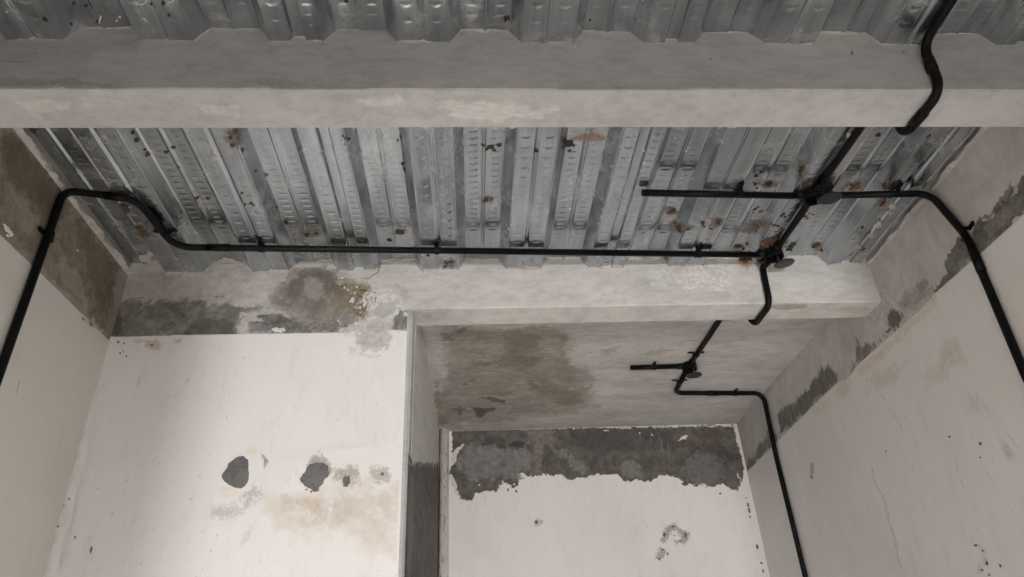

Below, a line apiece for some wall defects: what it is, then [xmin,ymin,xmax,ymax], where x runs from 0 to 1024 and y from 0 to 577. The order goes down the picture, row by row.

rust [226,129,244,151]
rust [563,131,604,152]
rust [753,171,777,189]
rust [665,207,723,233]
rust [733,206,796,275]
flaking render [336,273,377,327]
leakage [0,128,1024,577]
peeling [449,444,464,496]
peeling [653,519,693,564]